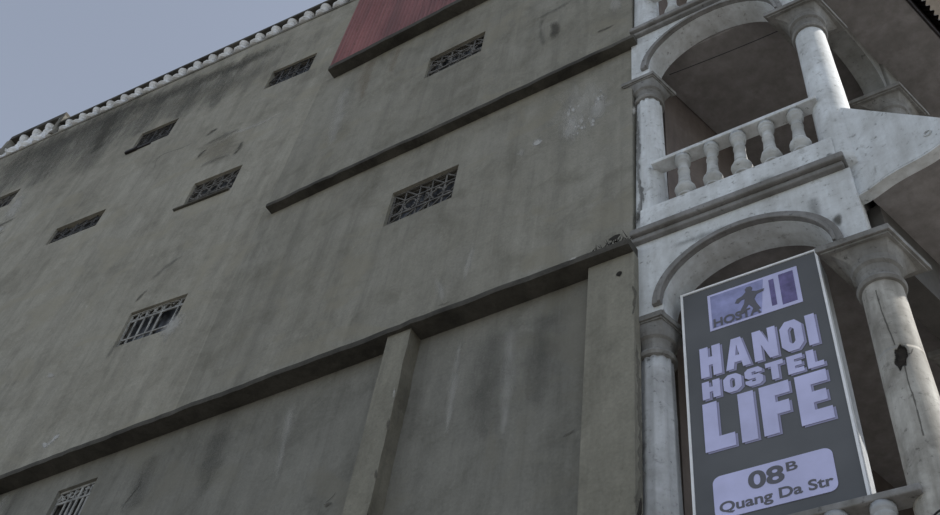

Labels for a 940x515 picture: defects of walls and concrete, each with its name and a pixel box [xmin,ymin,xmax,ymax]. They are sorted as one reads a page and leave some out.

flaking render [875,290,924,436]